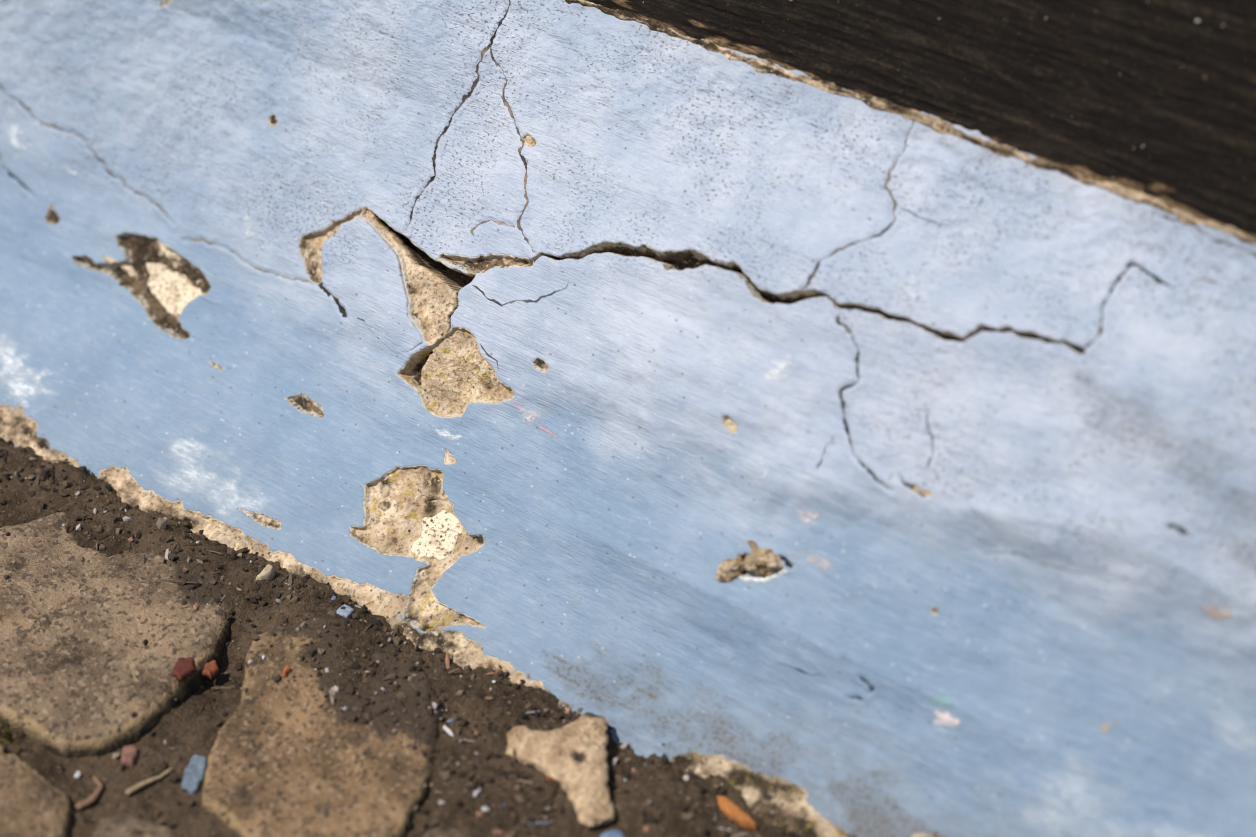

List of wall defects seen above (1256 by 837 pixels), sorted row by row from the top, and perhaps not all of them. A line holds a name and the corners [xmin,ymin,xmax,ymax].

crack [0,84,31,111]
crack [0,156,33,195]
crack [65,130,165,213]
spalling [71,232,211,340]
spalling [298,206,515,418]
crack [406,0,1217,497]
crack [1158,214,1256,257]
spalling [284,394,324,418]
spalling [97,448,547,691]
spalling [715,540,793,583]
peeling [671,750,858,837]